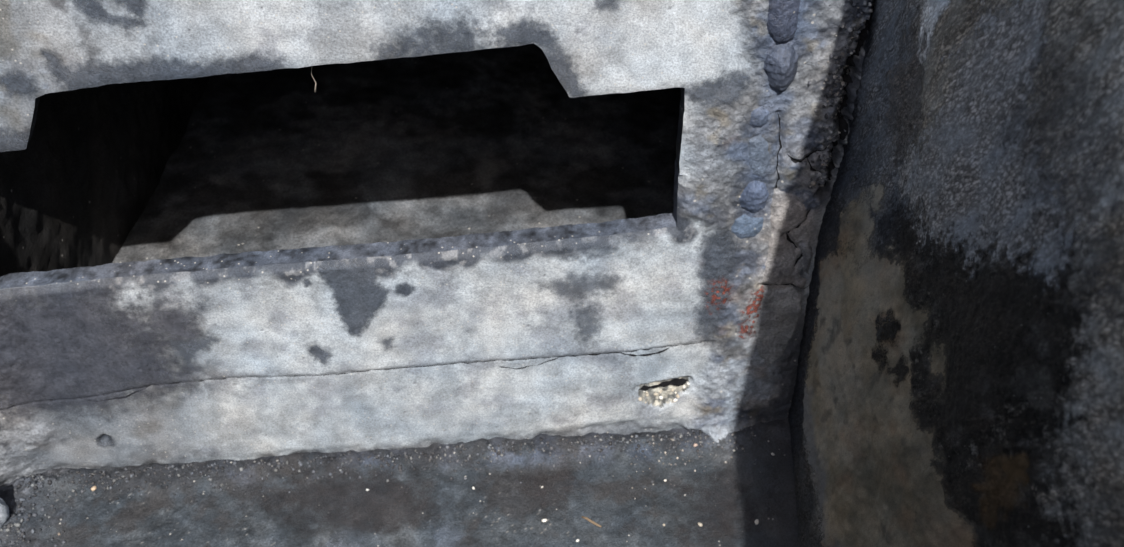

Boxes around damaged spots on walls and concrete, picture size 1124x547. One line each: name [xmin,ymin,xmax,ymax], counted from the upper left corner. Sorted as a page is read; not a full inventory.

water stain [303,260,414,336]
water stain [552,274,620,341]
corrosion [739,286,764,339]
water stain [871,0,1123,547]
crack [277,341,717,377]
crack [81,377,246,400]
spalling [638,376,690,408]